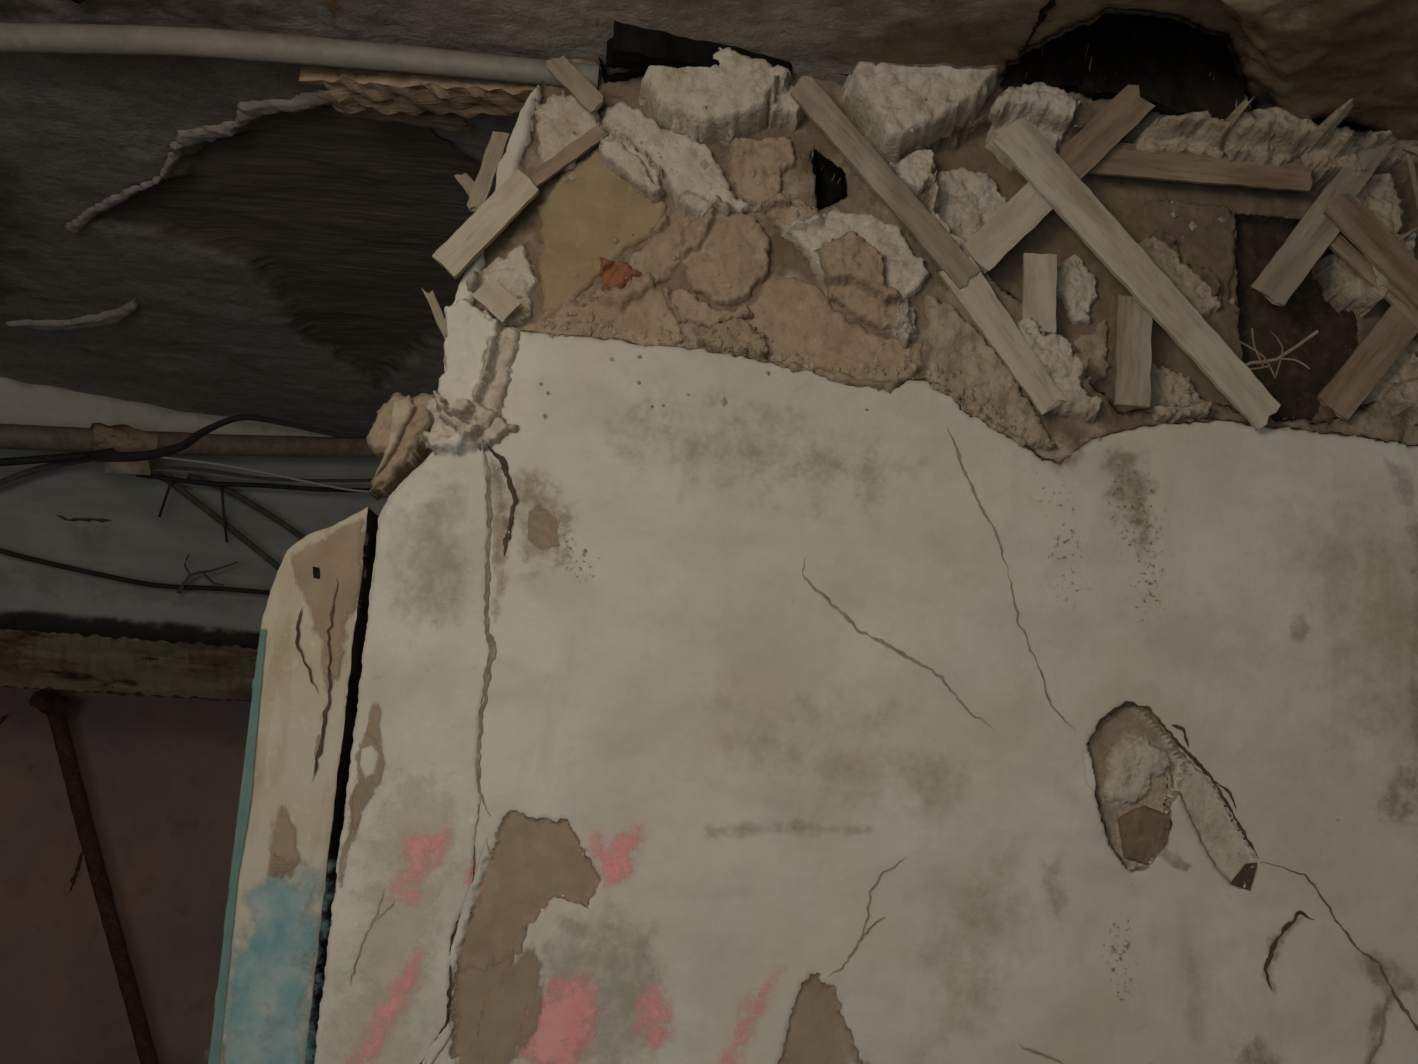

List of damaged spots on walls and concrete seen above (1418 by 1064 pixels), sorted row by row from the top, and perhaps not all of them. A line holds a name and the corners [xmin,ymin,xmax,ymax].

crack [1023,0,1056,52]
damp [831,0,1418,140]
peeling [438,47,1240,451]
spalling [841,7,1418,426]
crack [476,439,519,816]
flaking render [351,733,384,828]
flaking render [1084,701,1259,891]
crack [420,847,475,1064]
peeling [422,810,601,1064]
peeling [778,973,863,1064]
crack [1263,862,1418,1064]